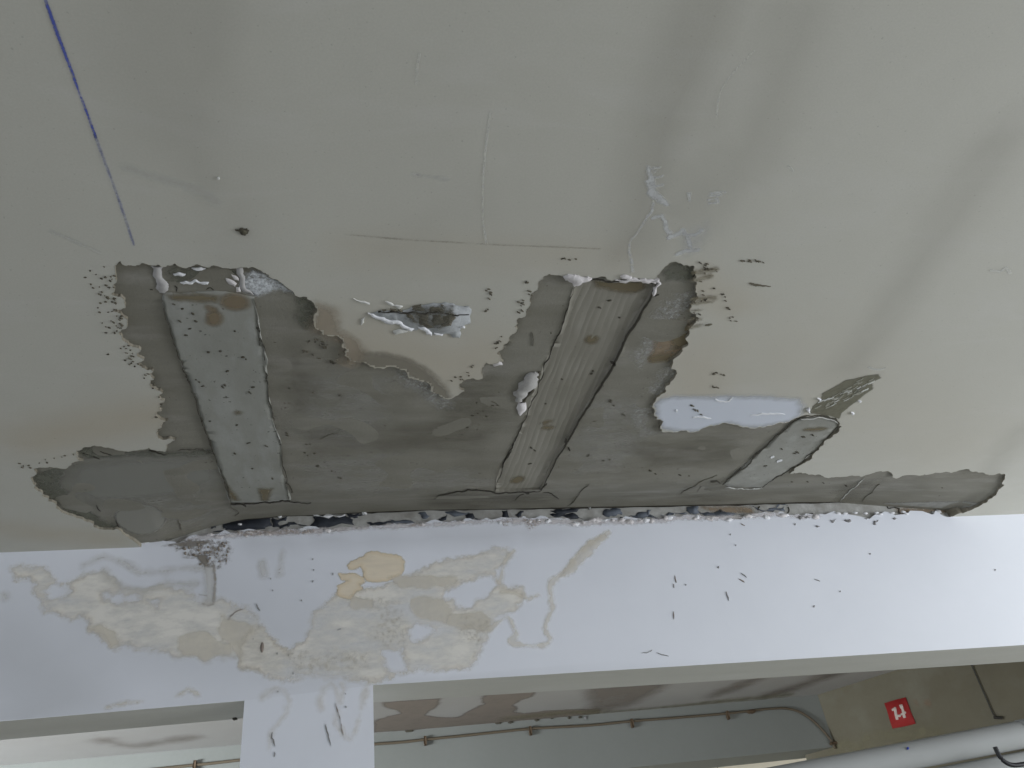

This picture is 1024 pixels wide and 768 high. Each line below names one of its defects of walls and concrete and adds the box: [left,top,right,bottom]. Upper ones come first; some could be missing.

crack [149,278,845,520]
flaking render [18,261,1005,547]
water stain [13,540,525,683]